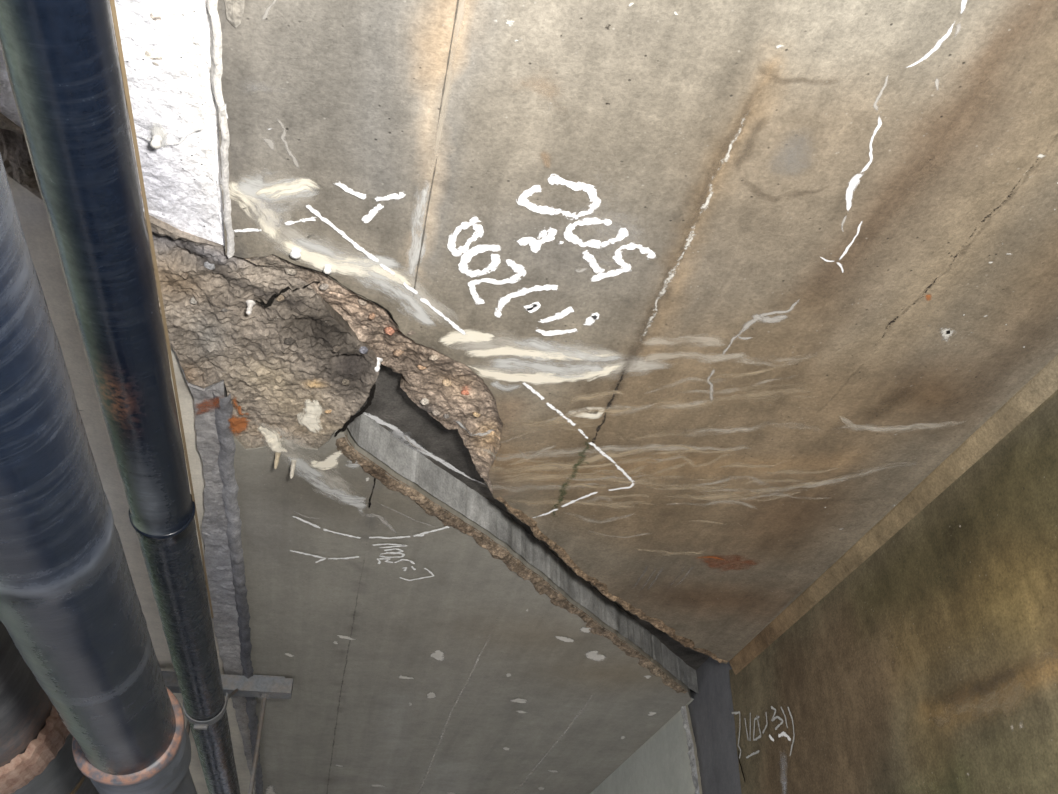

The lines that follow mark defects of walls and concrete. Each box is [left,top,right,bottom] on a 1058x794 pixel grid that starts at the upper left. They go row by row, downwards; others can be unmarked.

spalling [0,113,43,200]
crack [255,257,399,327]
damp [440,330,766,390]
damp [364,412,485,485]
spalling [144,212,729,794]
damp [532,391,630,426]
damp [490,445,846,508]
damp [842,418,939,431]